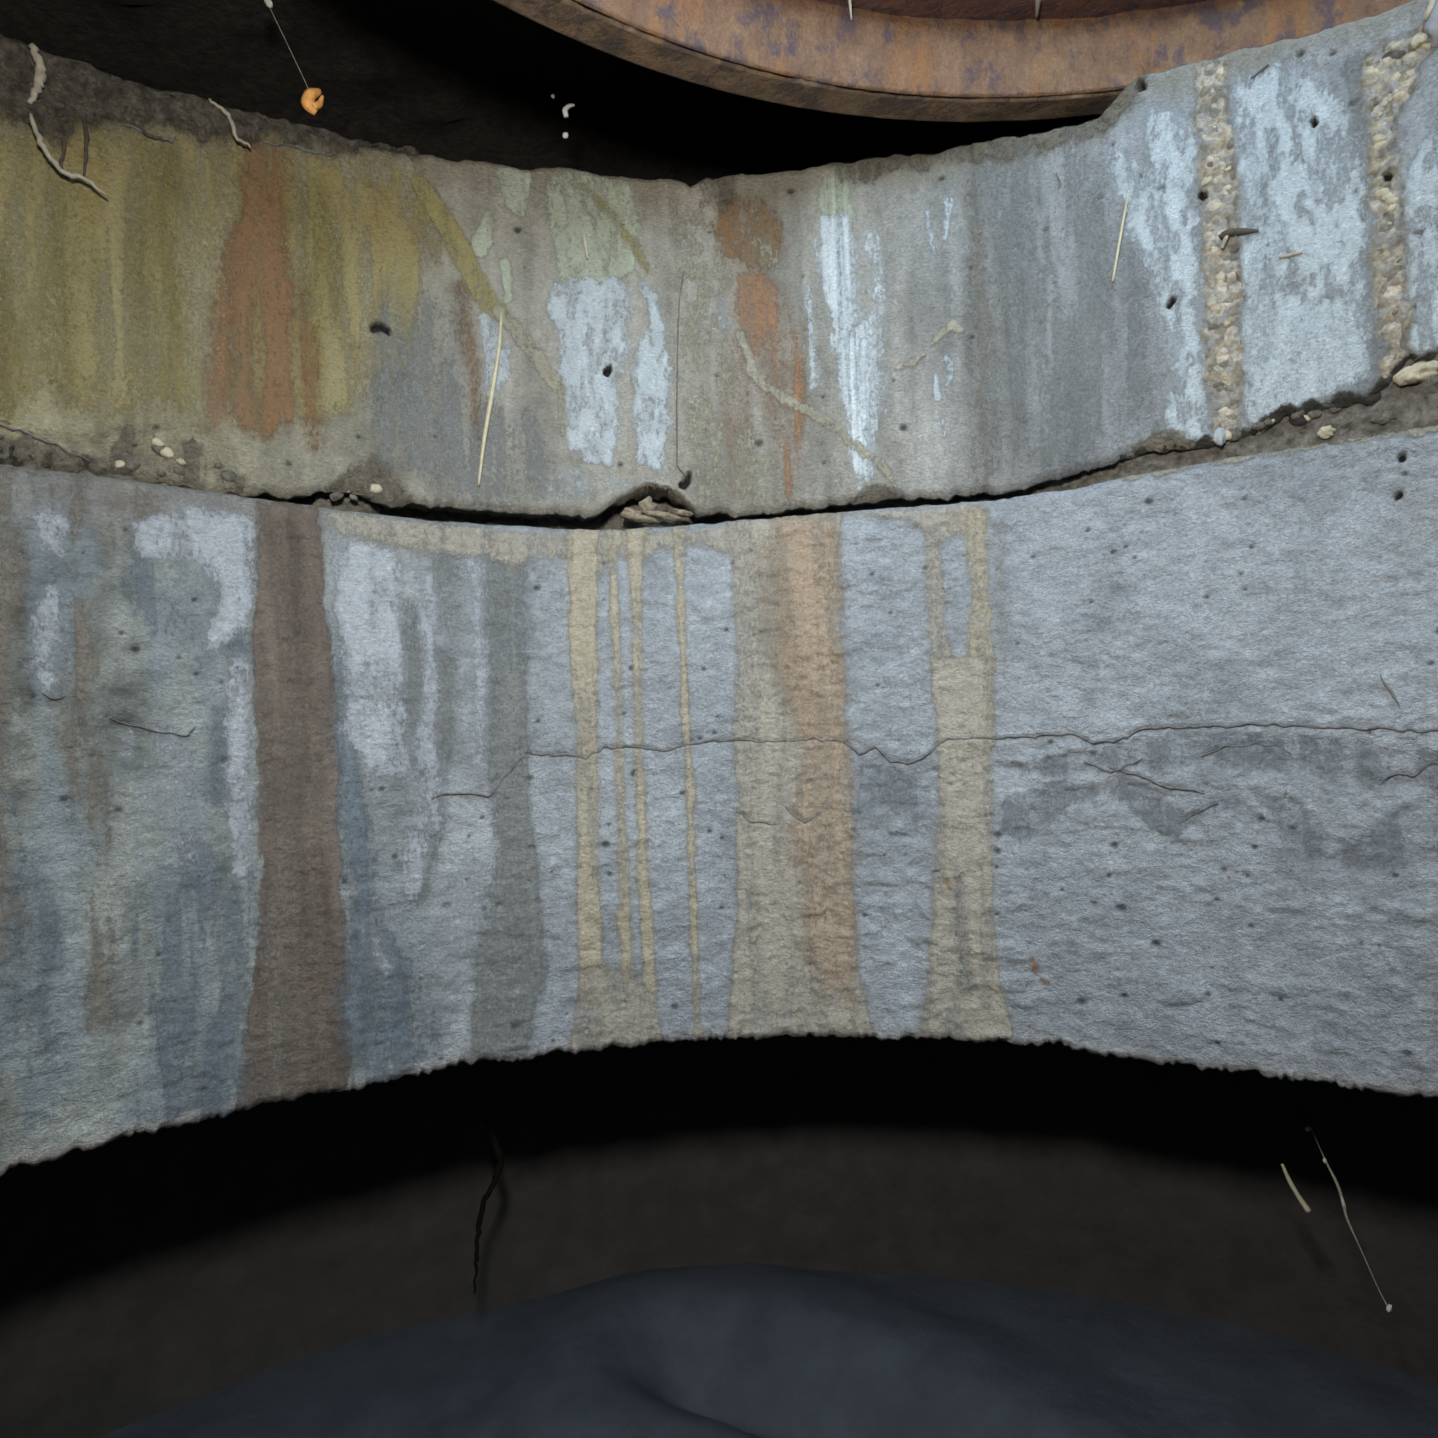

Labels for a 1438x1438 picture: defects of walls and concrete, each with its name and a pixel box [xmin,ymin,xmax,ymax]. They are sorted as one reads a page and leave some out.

leakage [29,583,63,692]
leakage [28,506,71,559]
leakage [122,506,259,1126]
leakage [327,510,737,1087]
corrosion [711,195,807,498]
leakage [370,74,1214,510]
corrosion [726,512,875,1040]
leakage [842,504,1013,1041]
crack [431,722,1438,825]
leakage [1229,52,1381,435]
leakage [1208,425,1438,465]
leakage [1400,138,1438,361]